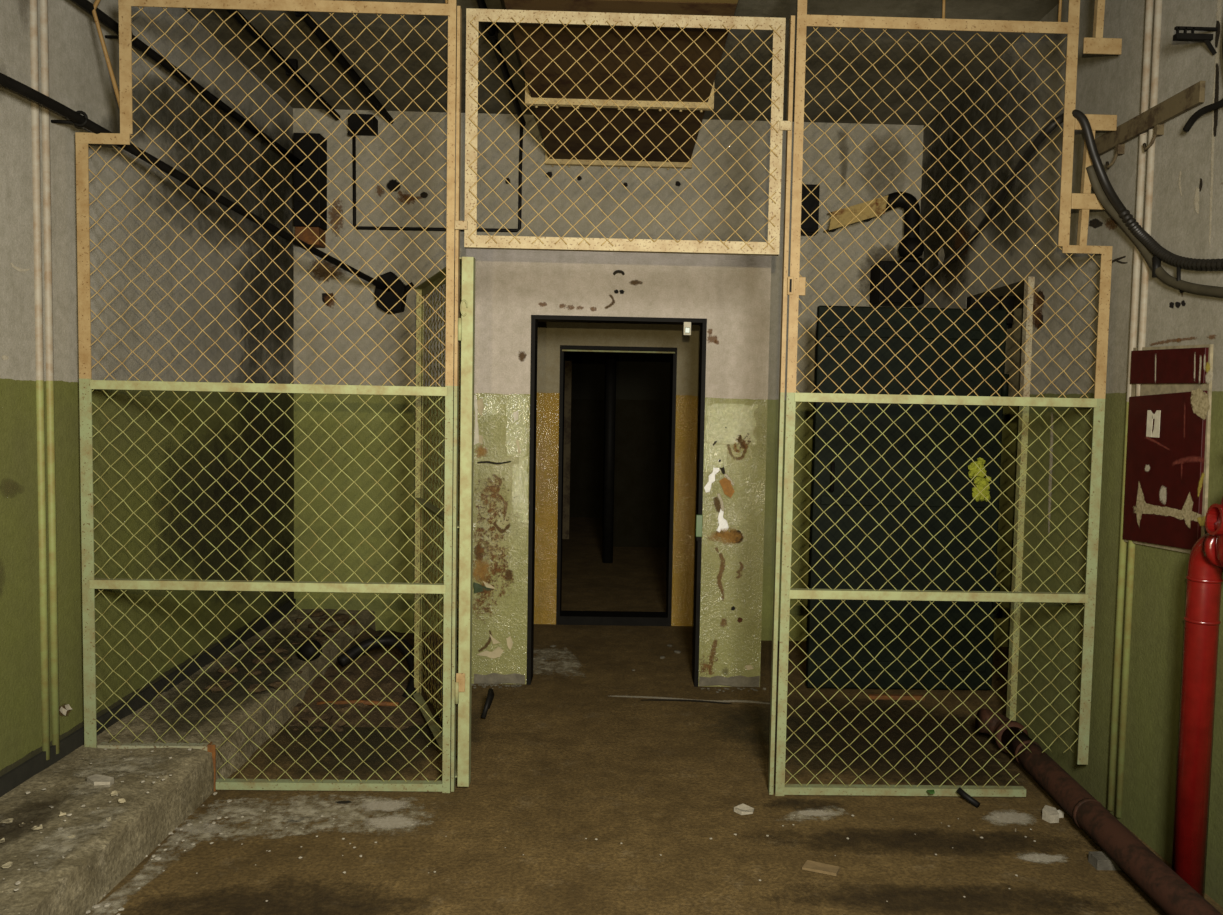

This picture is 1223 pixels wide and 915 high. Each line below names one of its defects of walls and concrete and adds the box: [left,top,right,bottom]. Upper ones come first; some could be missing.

peeling [704,459,735,533]
peeling [473,581,495,593]
peeling [477,631,513,658]
spalling [474,673,525,684]